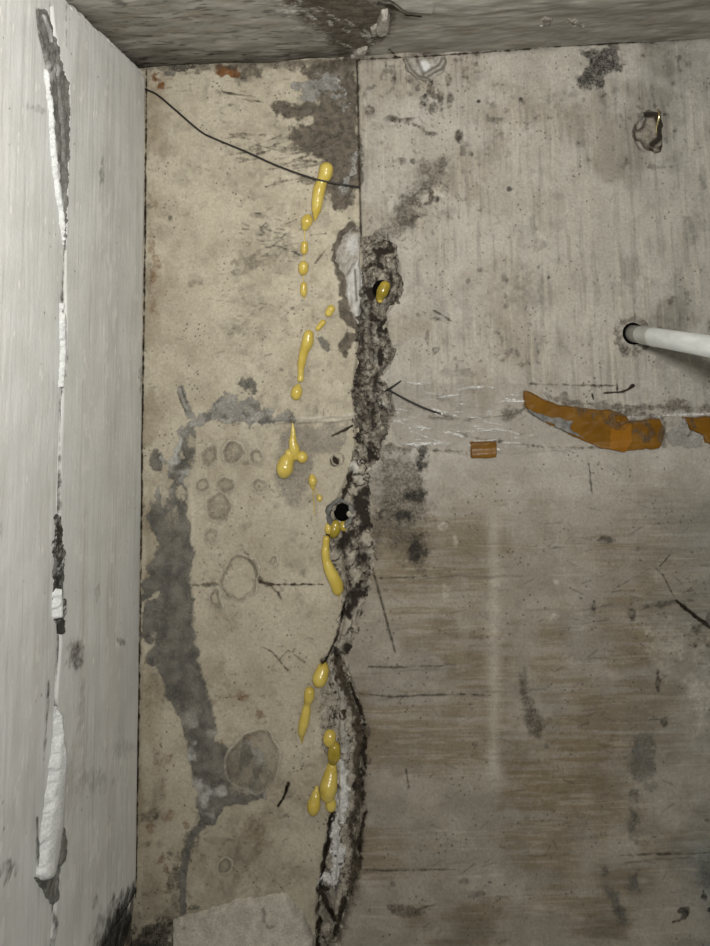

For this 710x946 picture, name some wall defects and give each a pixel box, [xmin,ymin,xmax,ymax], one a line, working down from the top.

water stain [230,0,396,210]
peeling [350,7,390,60]
crack [45,246,67,743]
crack [247,222,476,946]